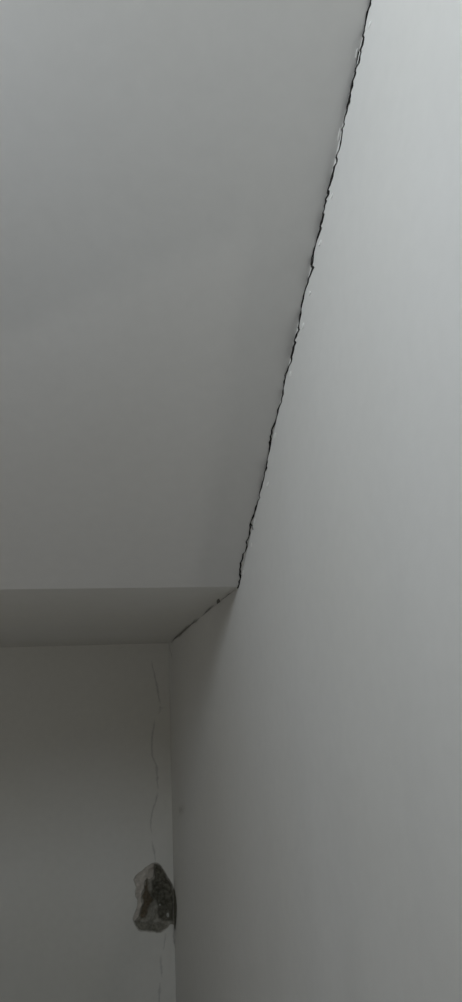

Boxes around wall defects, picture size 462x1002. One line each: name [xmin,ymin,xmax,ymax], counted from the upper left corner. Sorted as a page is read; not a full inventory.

crack [174,0,372,639]
spalling [133,862,177,933]